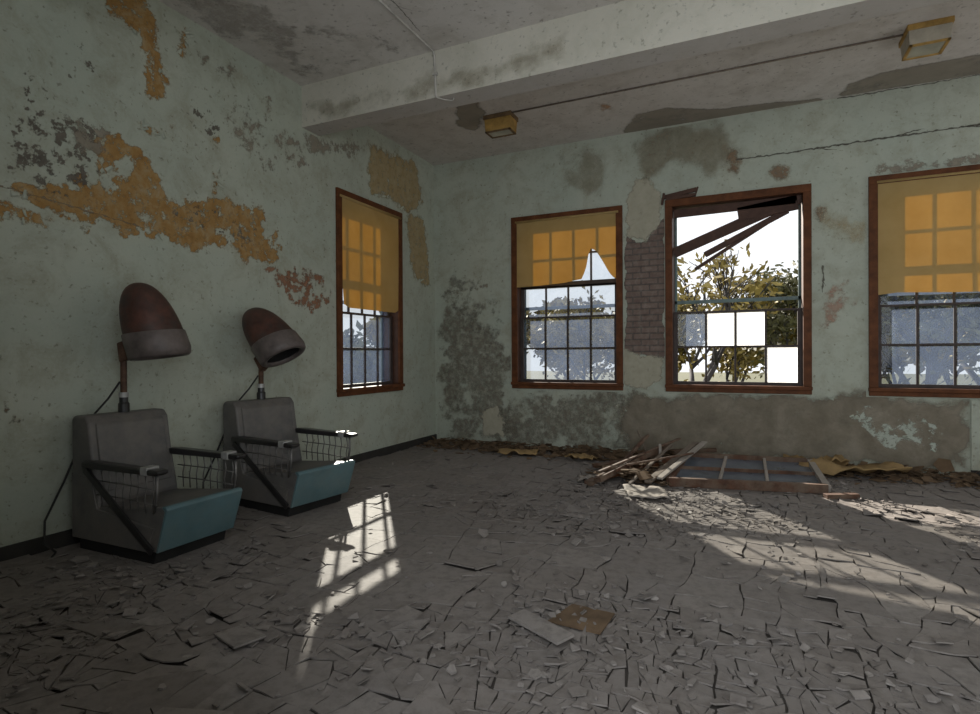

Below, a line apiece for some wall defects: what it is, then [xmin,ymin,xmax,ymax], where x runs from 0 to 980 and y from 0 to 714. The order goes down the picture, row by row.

peeling [105,0,169,99]
damp [840,55,980,96]
peeling [0,73,282,265]
peeling [187,105,429,286]
spalling [661,186,699,205]
damp [624,98,822,177]
damp [438,278,636,450]